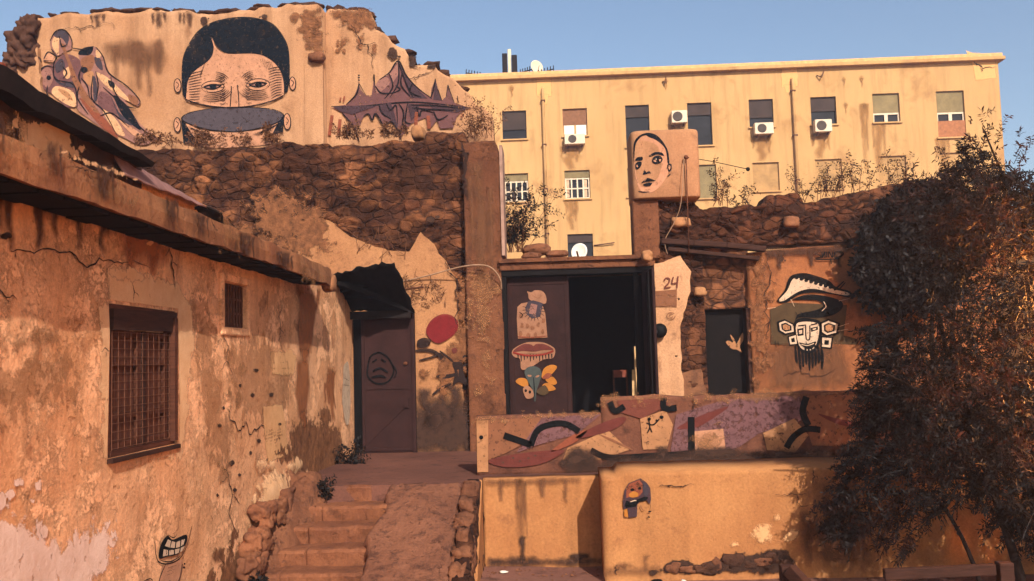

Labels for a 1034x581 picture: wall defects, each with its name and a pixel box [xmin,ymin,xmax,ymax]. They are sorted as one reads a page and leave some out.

spalling [2,13,42,74]
leakage [111,42,162,88]
crack [11,248,177,300]
crack [228,409,265,437]
peeling [0,478,119,581]
flaking render [650,515,798,576]